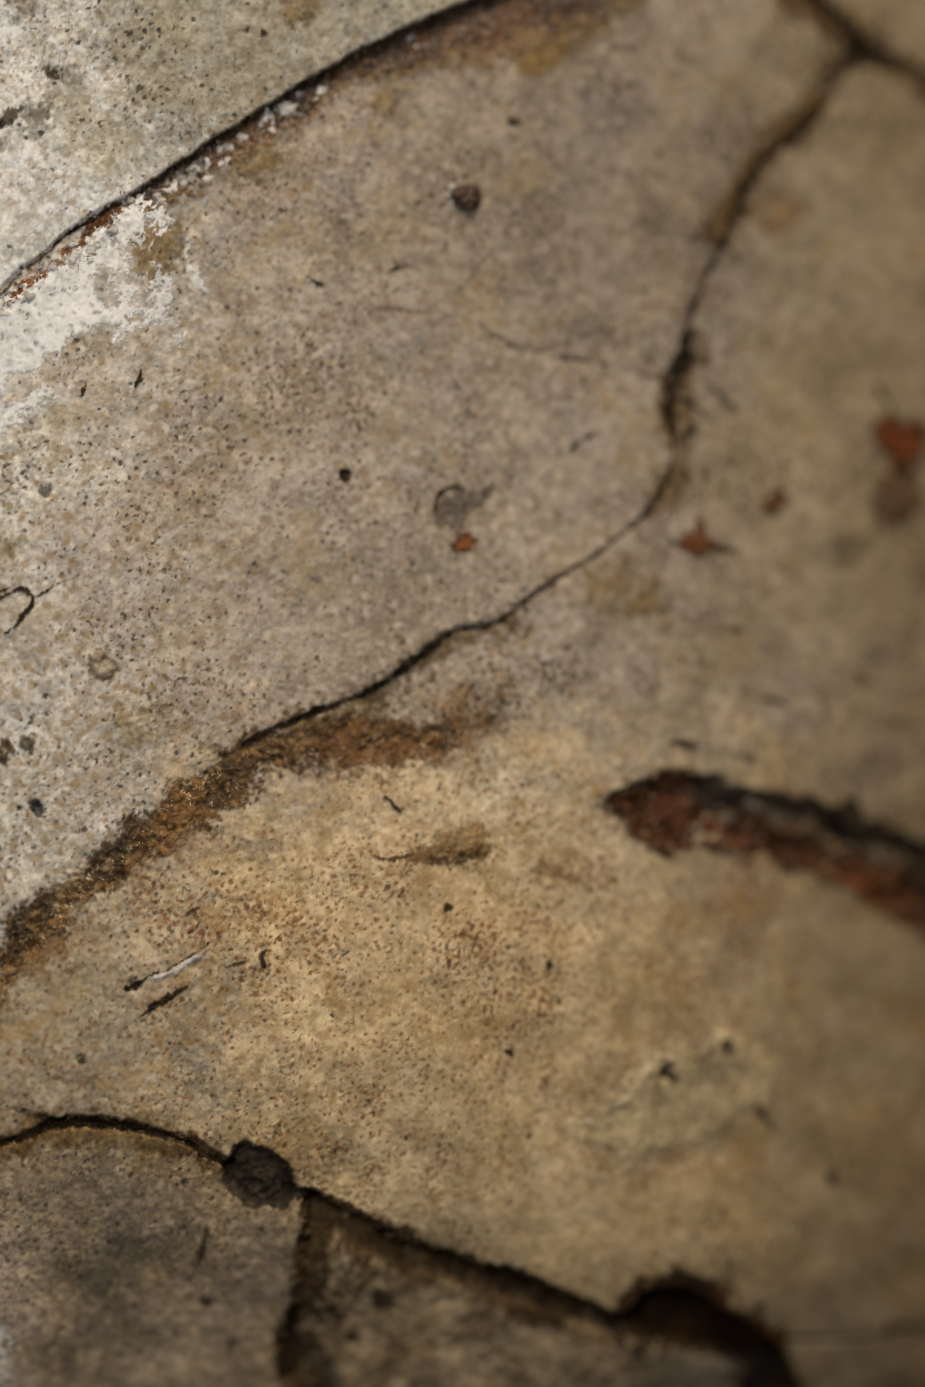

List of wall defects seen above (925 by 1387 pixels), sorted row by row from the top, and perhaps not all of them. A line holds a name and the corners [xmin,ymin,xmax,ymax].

crack [0,0,490,295]
efflorescence [0,177,208,434]
crack [134,369,144,388]
crack [243,0,925,746]
corrosion [872,384,925,477]
corrosion [761,487,787,515]
corrosion [670,519,739,558]
crack [0,574,79,634]
crack [669,739,756,761]
crack [0,1110,228,1167]
crack [284,1183,322,1205]
crack [194,1228,209,1268]